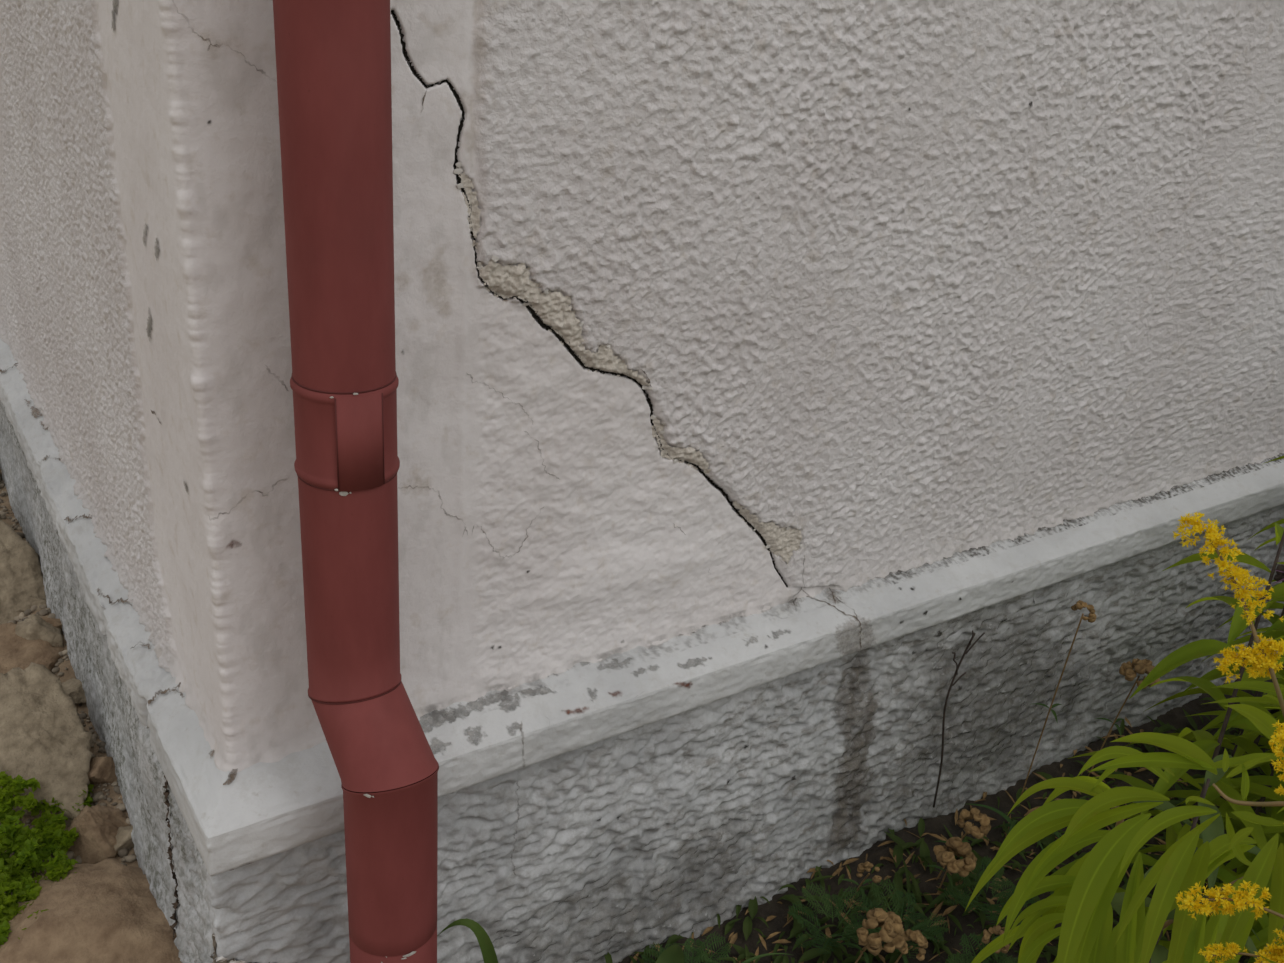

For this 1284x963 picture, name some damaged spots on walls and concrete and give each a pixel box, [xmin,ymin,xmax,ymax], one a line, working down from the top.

crack [391,10,869,653]
spalling [650,415,711,474]